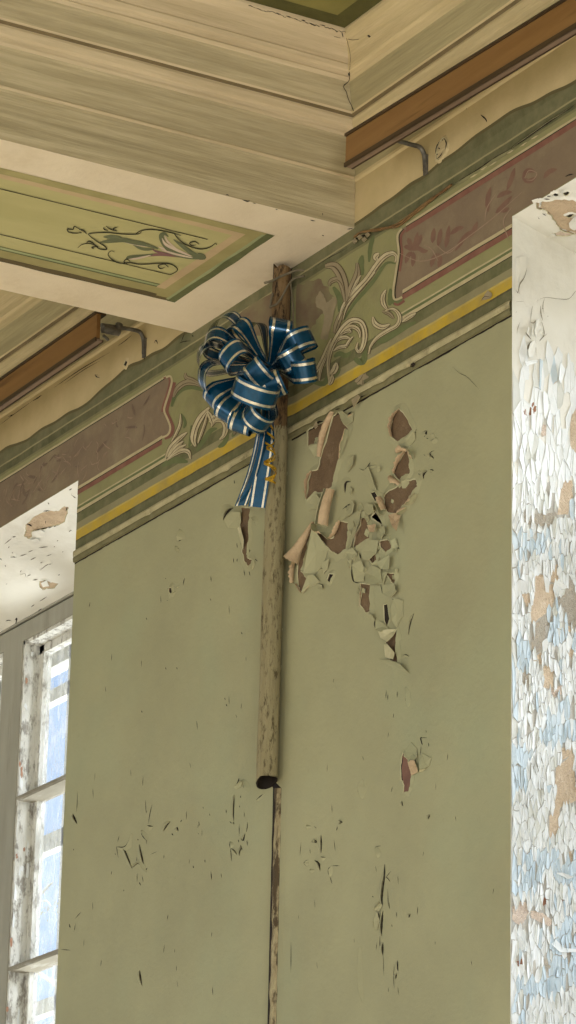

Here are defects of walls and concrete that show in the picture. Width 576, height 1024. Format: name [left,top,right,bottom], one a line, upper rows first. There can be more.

crack [248,5,358,111]
spalling [532,174,576,238]
spalling [0,489,78,590]
peeling [220,501,260,575]
peeling [283,373,422,674]
peeling [511,306,576,1024]
peeling [398,737,431,798]